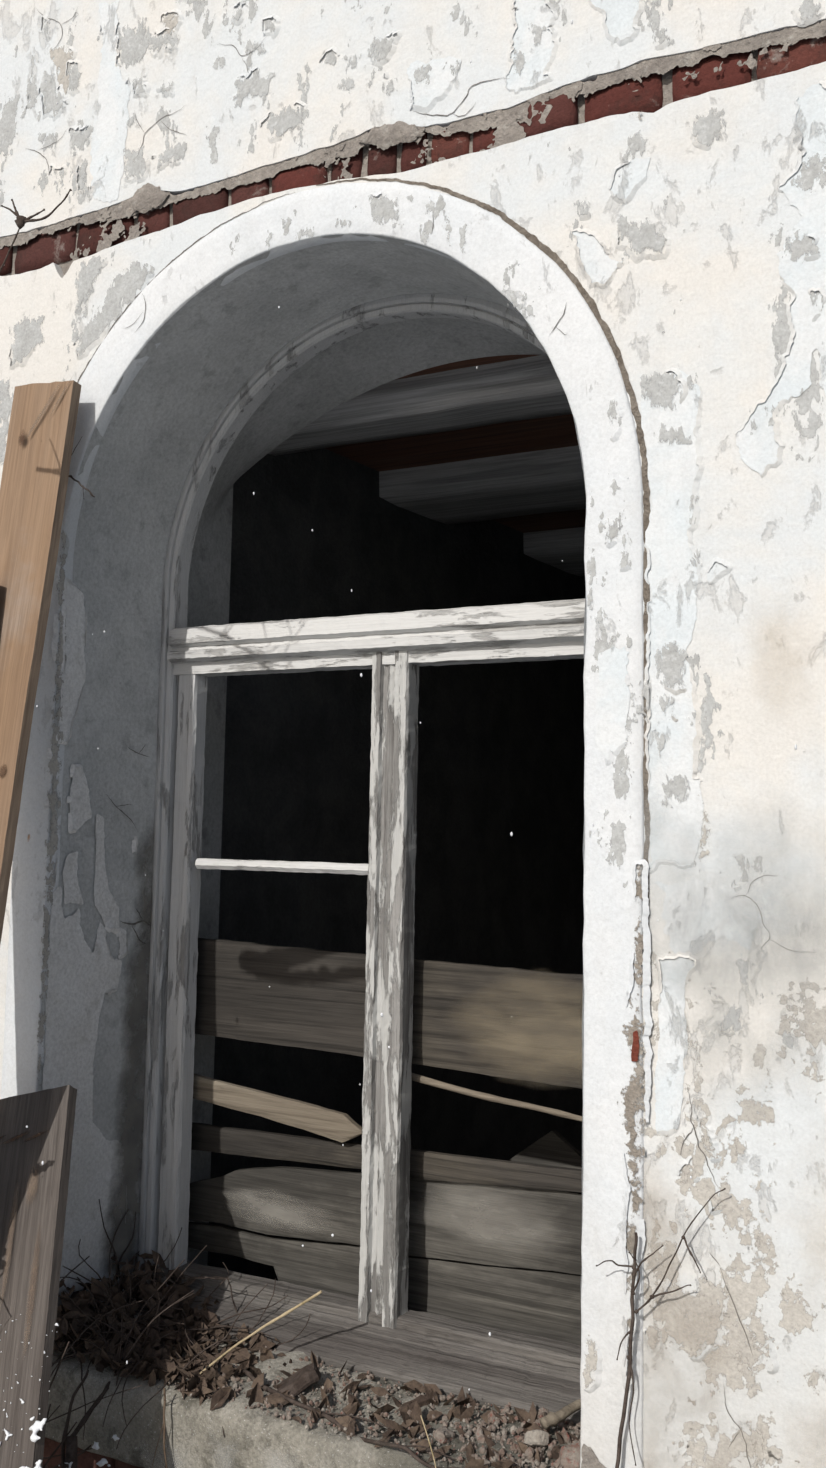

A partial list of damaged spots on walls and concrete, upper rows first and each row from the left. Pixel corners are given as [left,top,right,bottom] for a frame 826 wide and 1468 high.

peeling [450,3,478,36]
peeling [504,0,567,95]
peeling [682,0,825,81]
peeling [690,108,726,151]
peeling [0,0,467,381]
peeling [569,132,671,289]
peeling [503,263,541,318]
peeling [735,80,826,478]
peeling [37,531,128,1293]
peeling [587,368,826,1468]
spalling [582,1335,603,1393]
spalling [213,1366,606,1468]